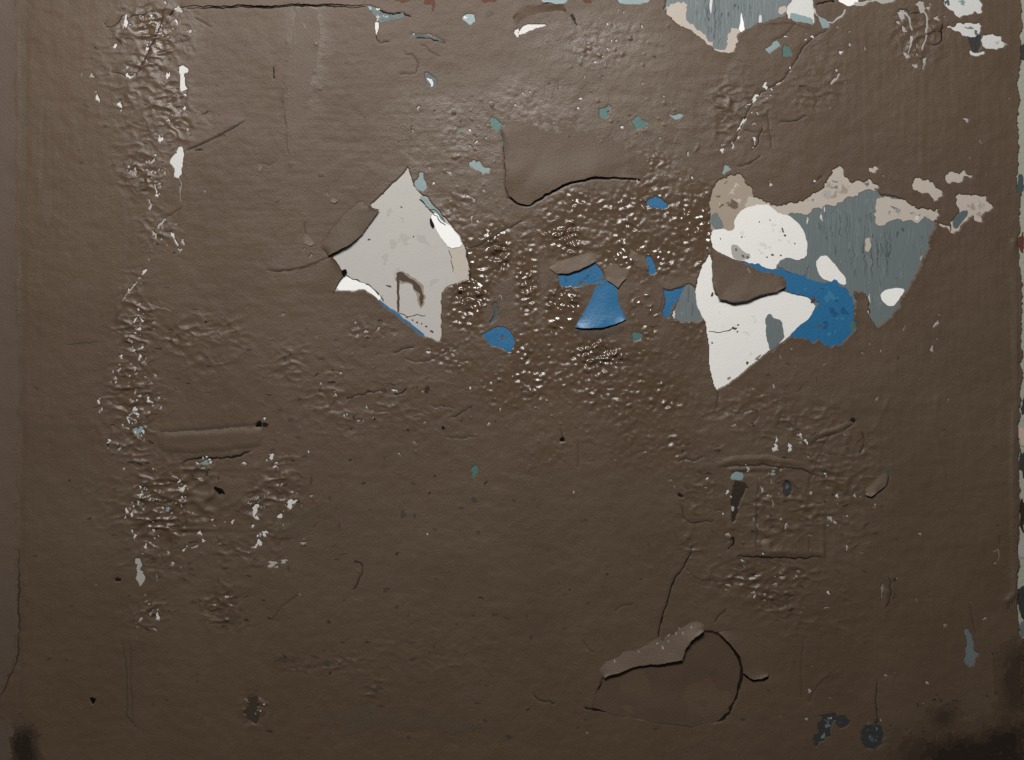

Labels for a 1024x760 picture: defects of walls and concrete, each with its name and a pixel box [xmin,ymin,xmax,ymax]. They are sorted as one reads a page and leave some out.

crack [113,5,445,78]
peeling [664,0,1004,68]
crack [467,131,635,280]
spalling [114,309,157,379]
peeling [302,167,469,341]
peeling [483,302,515,352]
peeling [549,248,656,328]
peeling [663,131,993,390]
spalling [108,439,212,596]
crack [658,424,864,637]
peeling [964,629,979,667]
peeling [805,713,849,746]